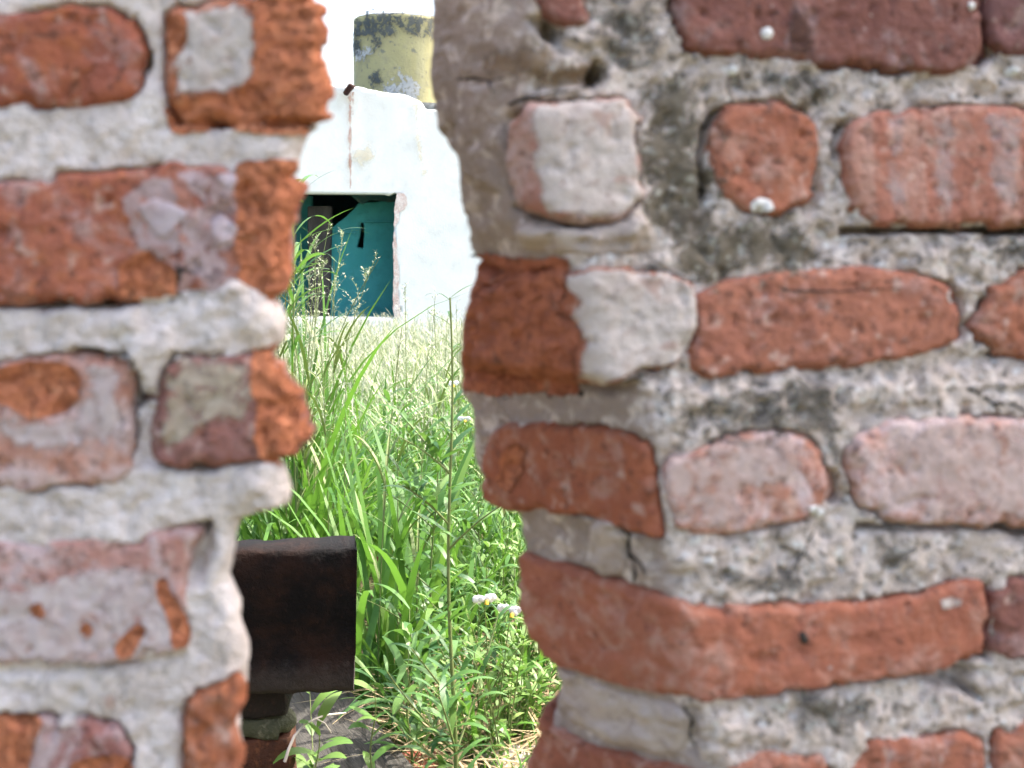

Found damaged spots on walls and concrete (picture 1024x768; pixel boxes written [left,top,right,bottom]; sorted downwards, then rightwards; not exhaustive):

crack [619,525,646,583]